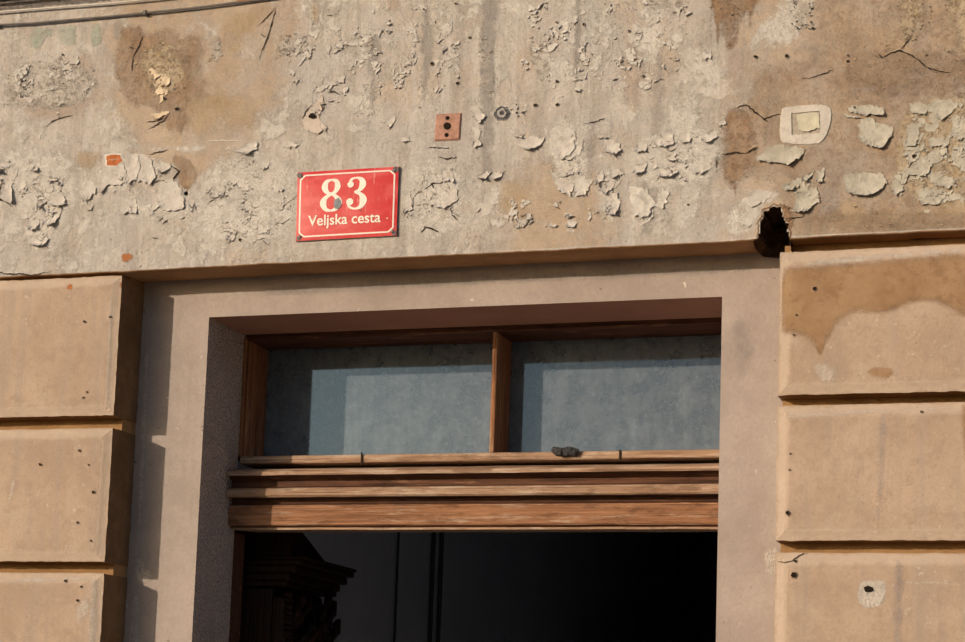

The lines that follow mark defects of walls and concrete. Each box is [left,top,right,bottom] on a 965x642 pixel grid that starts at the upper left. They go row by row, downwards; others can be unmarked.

spalling [1,53,98,117]
spalling [134,39,188,120]
water stain [112,5,281,191]
crack [258,7,276,59]
peeling [276,4,460,134]
flaking render [514,0,965,258]
water stain [710,0,815,92]
crack [876,37,951,73]
peeling [0,141,303,256]
peeling [491,198,532,228]
water stain [781,249,965,384]